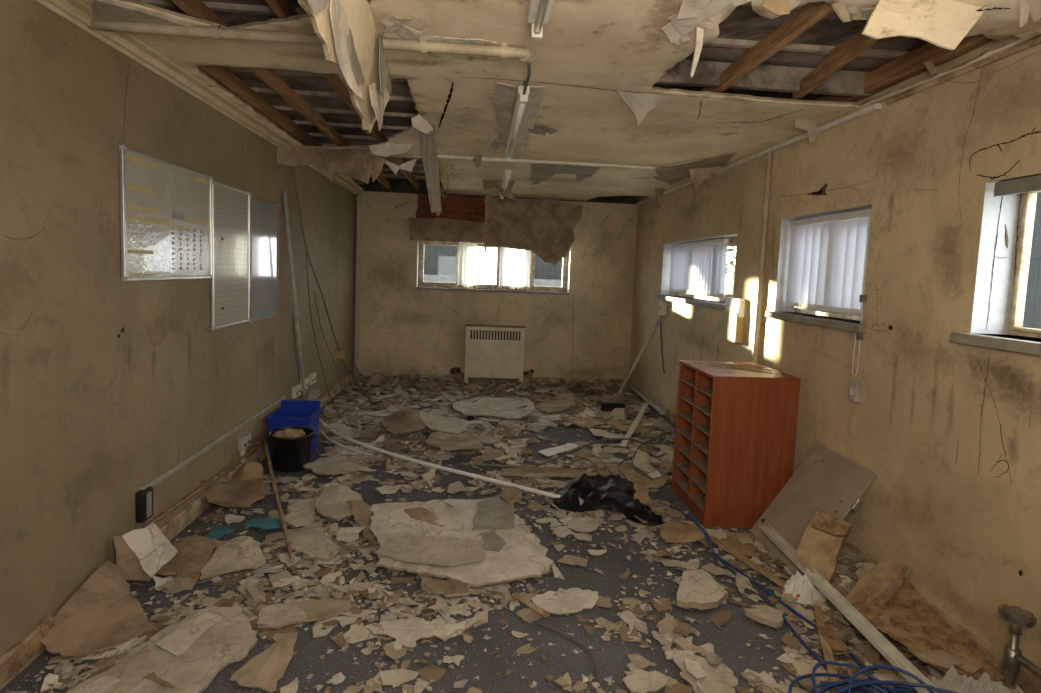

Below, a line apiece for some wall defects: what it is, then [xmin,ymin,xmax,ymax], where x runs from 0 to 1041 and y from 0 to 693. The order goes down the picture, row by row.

peeling [662,0,751,45]
flaking render [416,194,485,223]
crack [916,51,1041,330]
crack [954,350,1012,484]